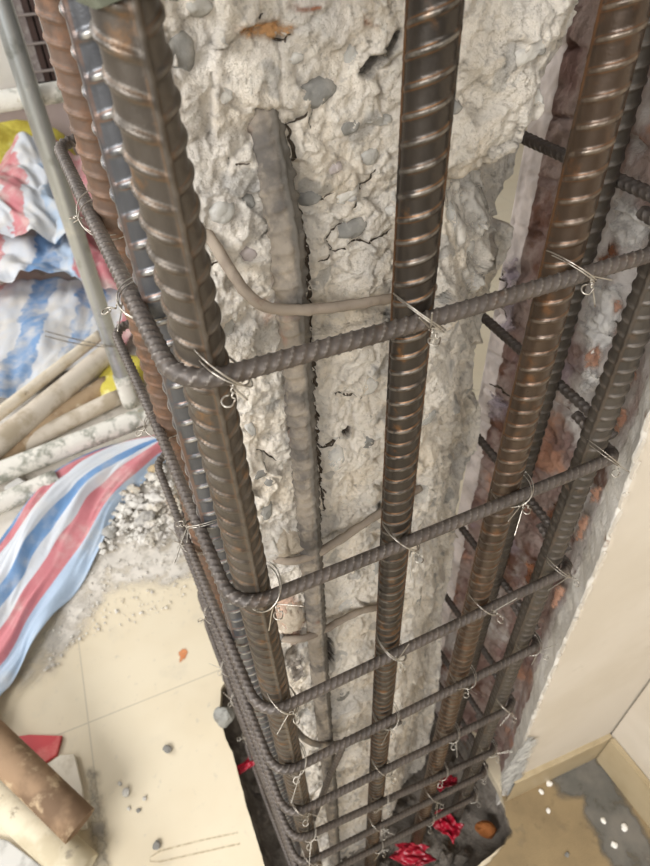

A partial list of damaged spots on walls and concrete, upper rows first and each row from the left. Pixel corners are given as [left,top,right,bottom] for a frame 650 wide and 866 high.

spalling [34,0,230,368]
spalling [116,285,334,703]
rust [241,21,293,38]
crack [285,109,313,161]
crack [299,169,389,516]
spalling [380,328,432,545]
spalling [359,0,495,321]
spalling [486,263,650,503]
spalling [537,0,650,279]
rust [598,243,618,261]
spalling [222,687,288,866]
spalling [250,471,607,866]